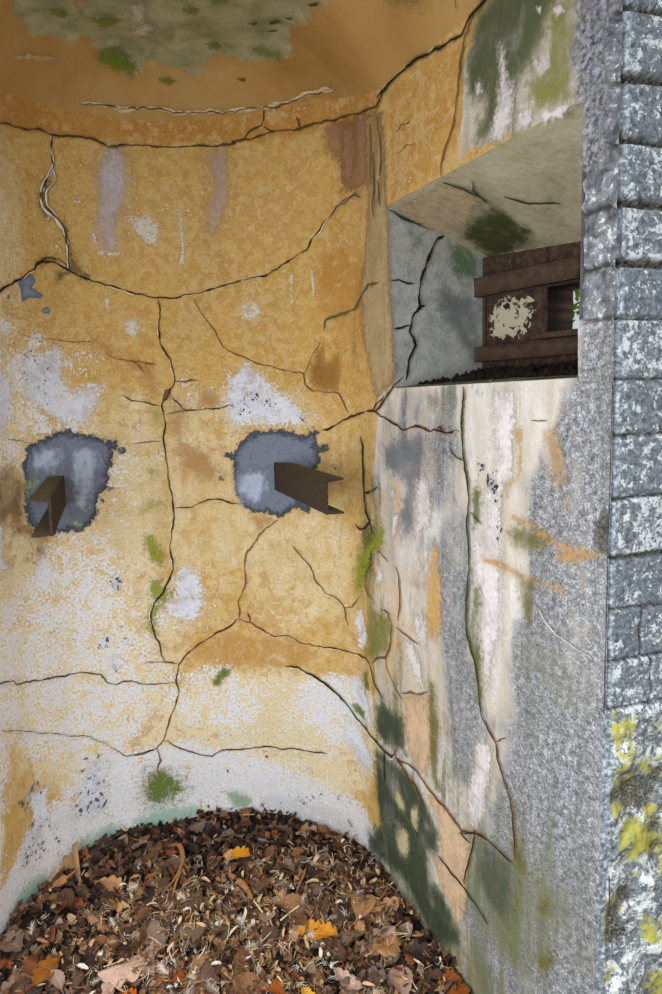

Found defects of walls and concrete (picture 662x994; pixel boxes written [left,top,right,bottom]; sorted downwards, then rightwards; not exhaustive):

peeling [7,274,51,314]
crack [0,0,561,925]
leakage [374,700,406,757]